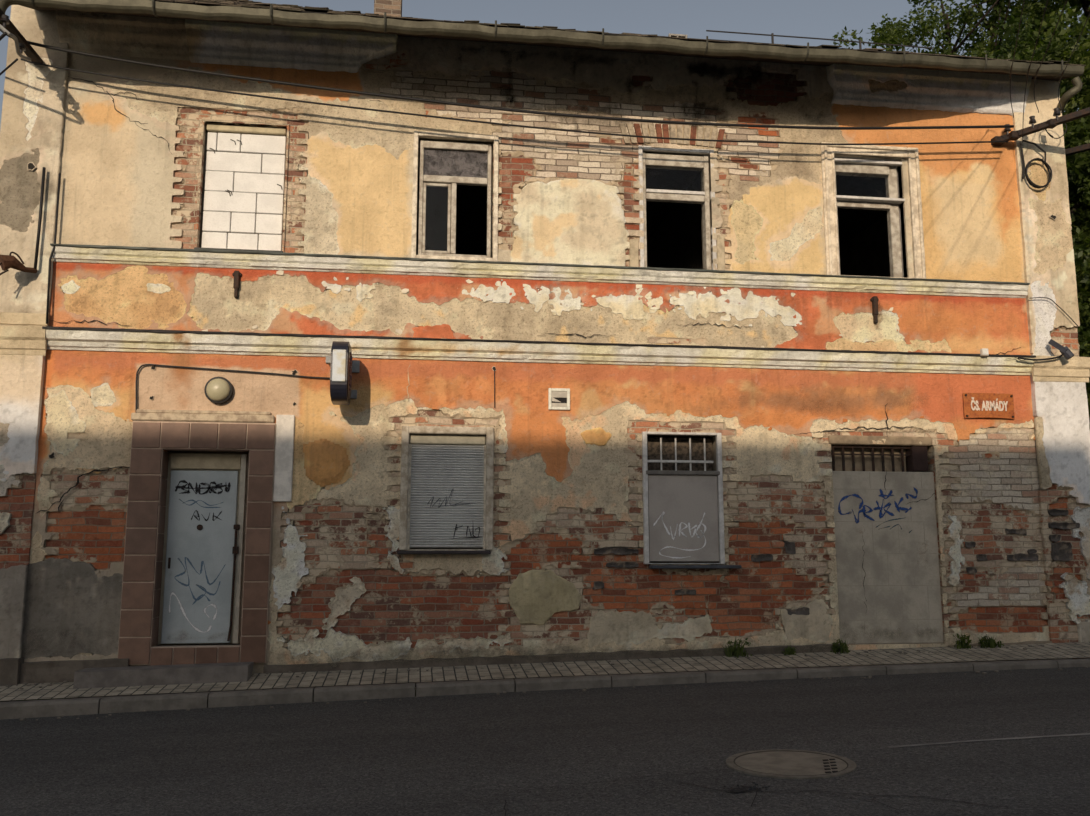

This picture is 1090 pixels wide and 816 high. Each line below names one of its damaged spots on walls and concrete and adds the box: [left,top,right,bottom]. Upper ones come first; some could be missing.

crack [68,76,172,154]
damp [682,62,762,127]
peeling [108,50,848,270]
peeling [58,265,802,348]
peeling [826,307,952,353]
crack [37,466,130,513]
peeling [267,398,1090,665]